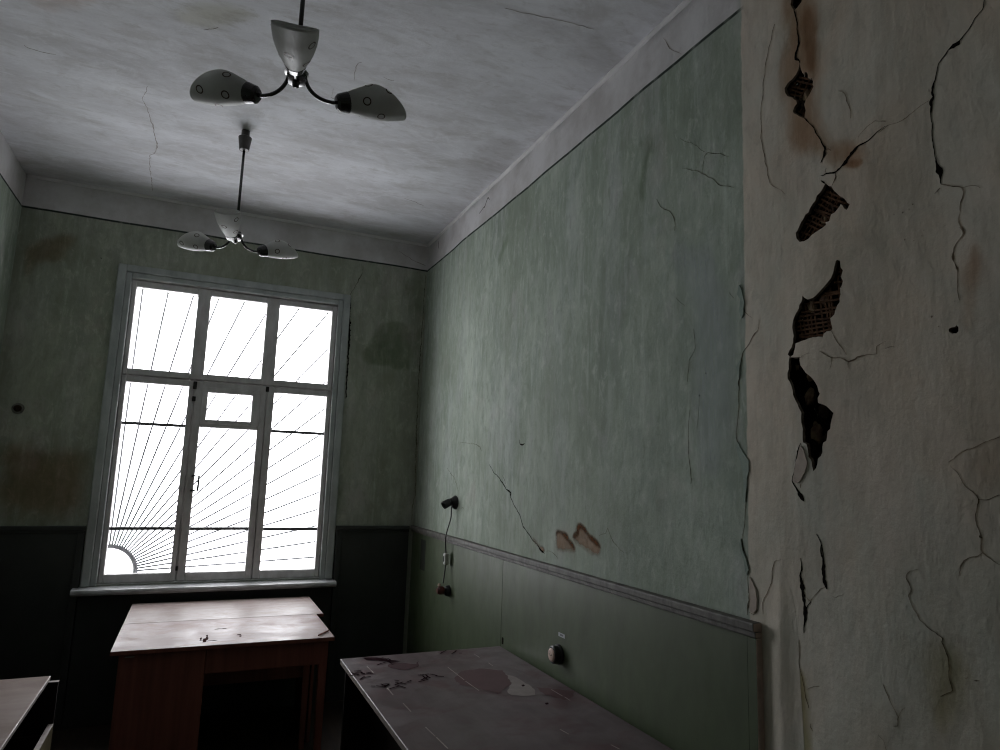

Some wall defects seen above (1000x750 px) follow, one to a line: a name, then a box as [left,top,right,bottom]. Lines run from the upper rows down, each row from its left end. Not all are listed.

crack [761,11,800,187]
flaking render [785,63,813,118]
crack [804,118,888,185]
crack [927,0,985,203]
flaking render [796,184,850,242]
crack [952,227,965,286]
flaking render [787,260,843,483]
crack [462,442,557,557]
peeling [556,524,600,554]
crack [792,443,804,501]
crack [955,470,998,575]
crack [799,534,827,729]